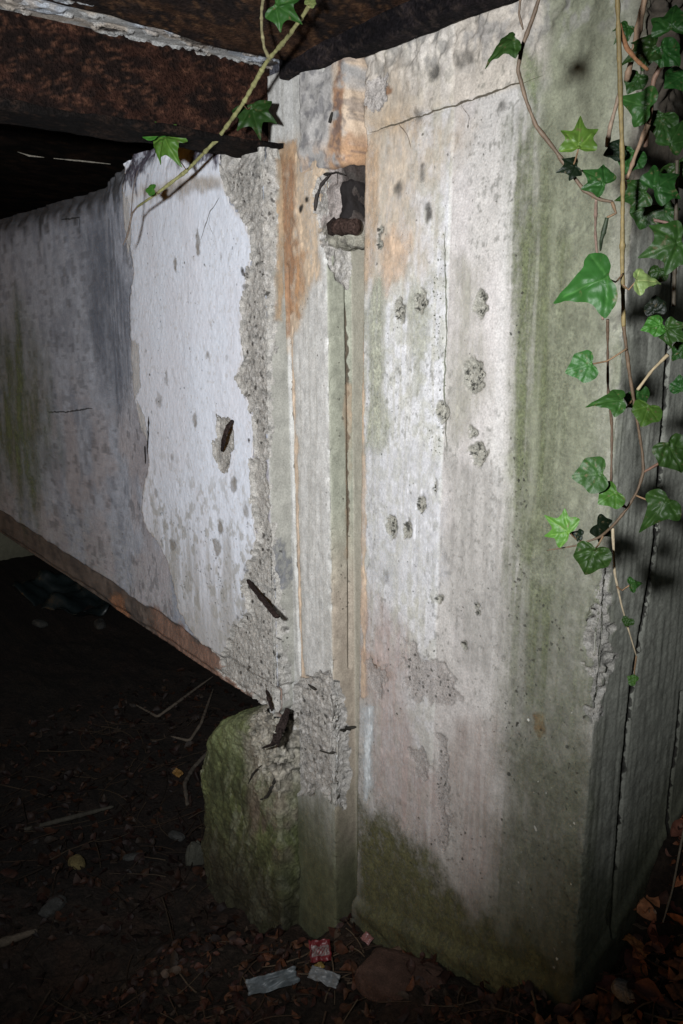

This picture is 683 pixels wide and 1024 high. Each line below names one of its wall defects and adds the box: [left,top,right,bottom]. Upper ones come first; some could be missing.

crack [369,76,541,147]
spalling [311,164,384,290]
spalling [211,147,353,811]
corrosion [276,141,325,678]
crack [655,465,663,489]
crack [660,344,670,433]
spalling [580,566,619,725]
crack [605,523,659,926]